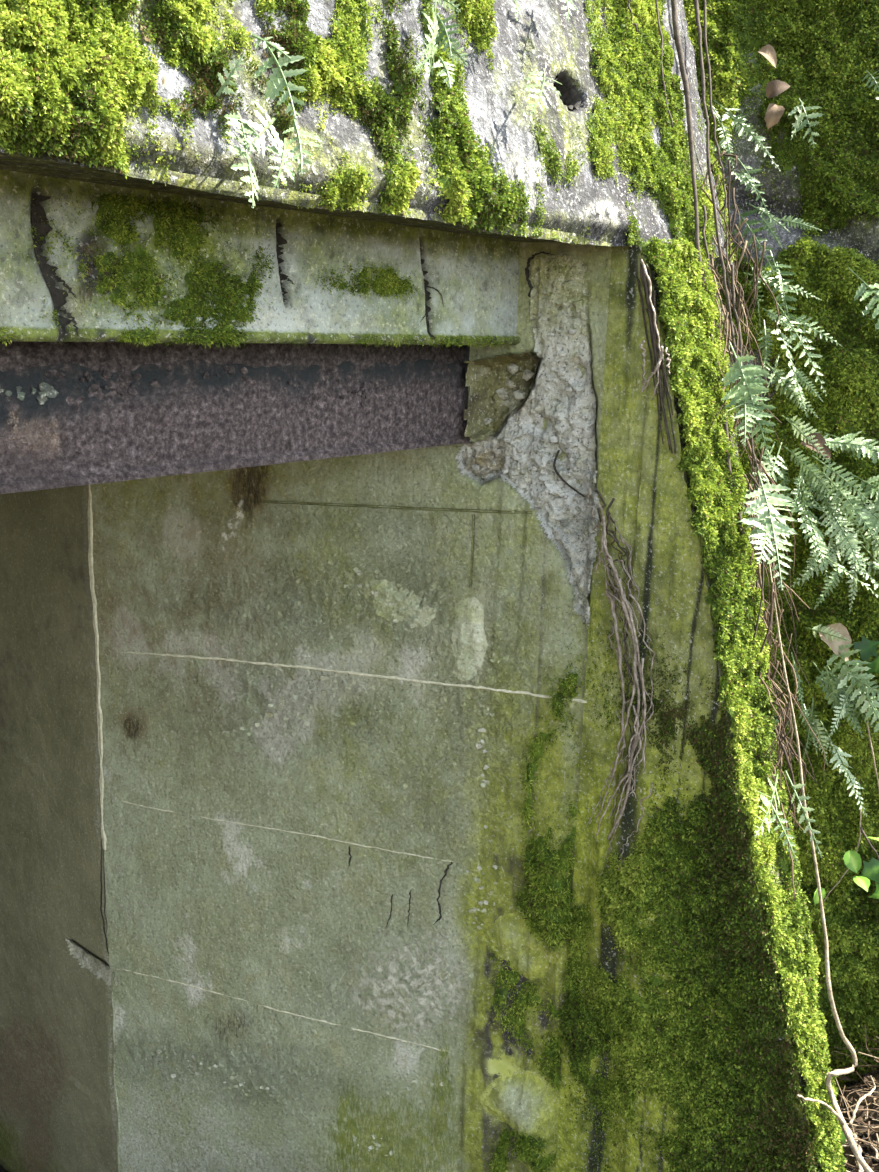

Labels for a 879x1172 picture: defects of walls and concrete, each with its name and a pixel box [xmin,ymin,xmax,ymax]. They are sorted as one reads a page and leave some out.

crack [31,194,78,338]
crack [276,223,295,300]
crack [420,249,444,340]
spalling [455,255,599,627]
leakage [222,465,268,550]
crack [386,861,453,927]